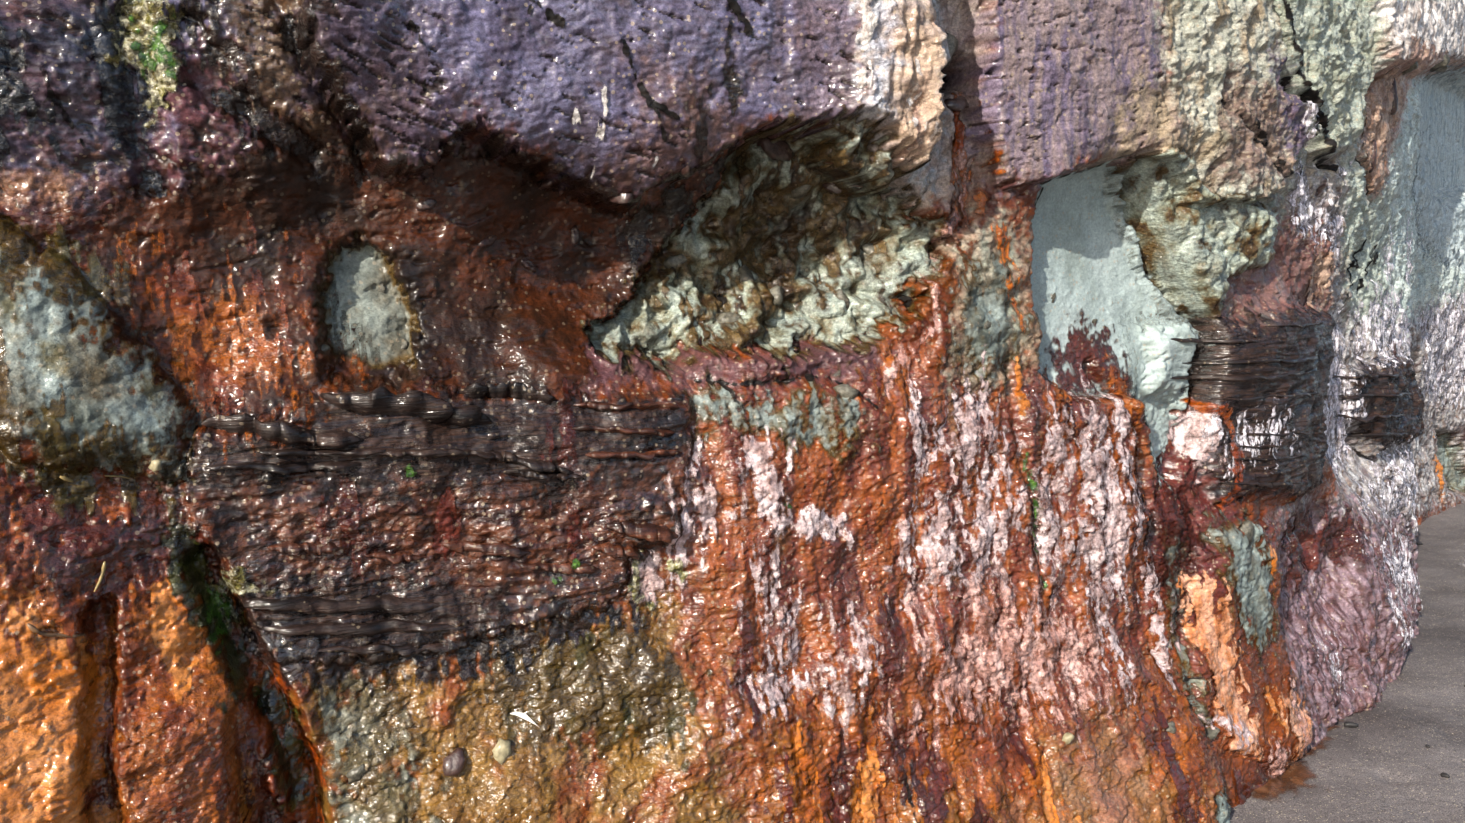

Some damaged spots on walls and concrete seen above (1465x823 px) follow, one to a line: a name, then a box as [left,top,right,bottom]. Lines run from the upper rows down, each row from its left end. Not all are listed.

crack [1221,0,1369,195]
spalling [1360,0,1465,279]
spalling [84,104,1216,489]
rust [0,416,326,823]
damp [315,478,377,579]
damp [415,487,462,567]
damp [242,590,644,703]
damp [540,377,607,561]
rust [721,589,1083,823]
damp [662,350,1182,756]
rust [1042,309,1339,823]